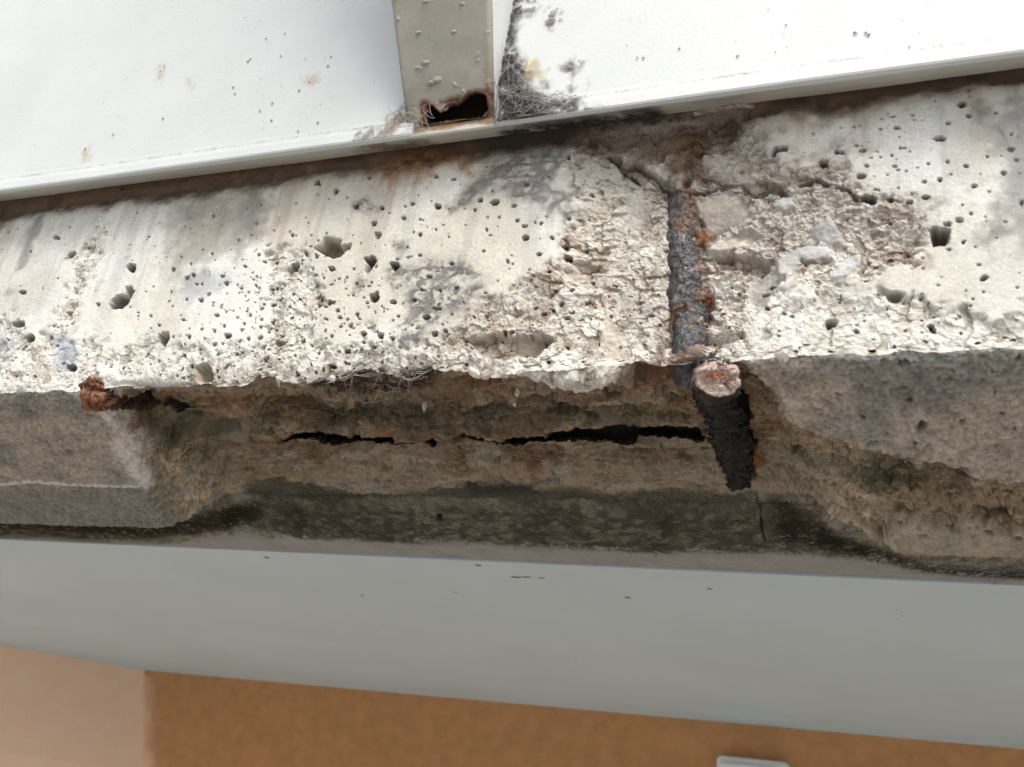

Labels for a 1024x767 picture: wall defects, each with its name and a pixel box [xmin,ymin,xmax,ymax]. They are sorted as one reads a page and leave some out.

spalling [78,110,1024,541]
crack [283,400,705,447]
leakage [437,485,636,501]